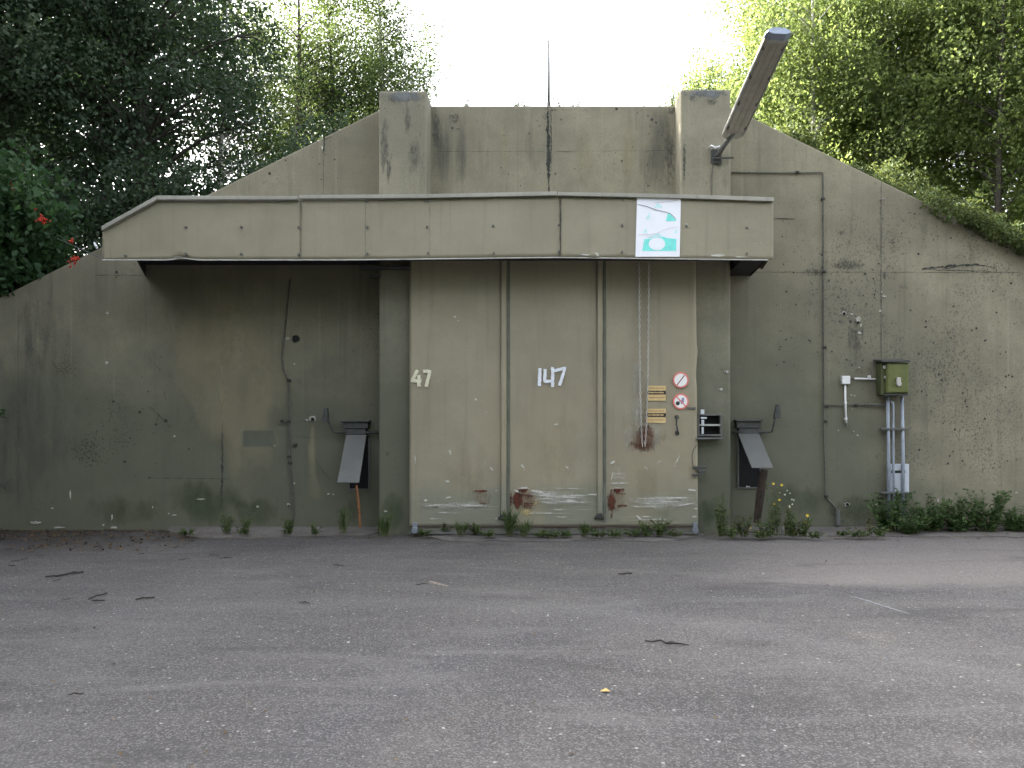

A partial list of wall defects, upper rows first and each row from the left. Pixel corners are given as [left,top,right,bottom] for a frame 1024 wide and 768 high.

rust [631,423,655,450]
rust [510,489,533,509]
peeling [514,487,604,517]
rust [607,488,627,517]
peeling [635,489,697,523]